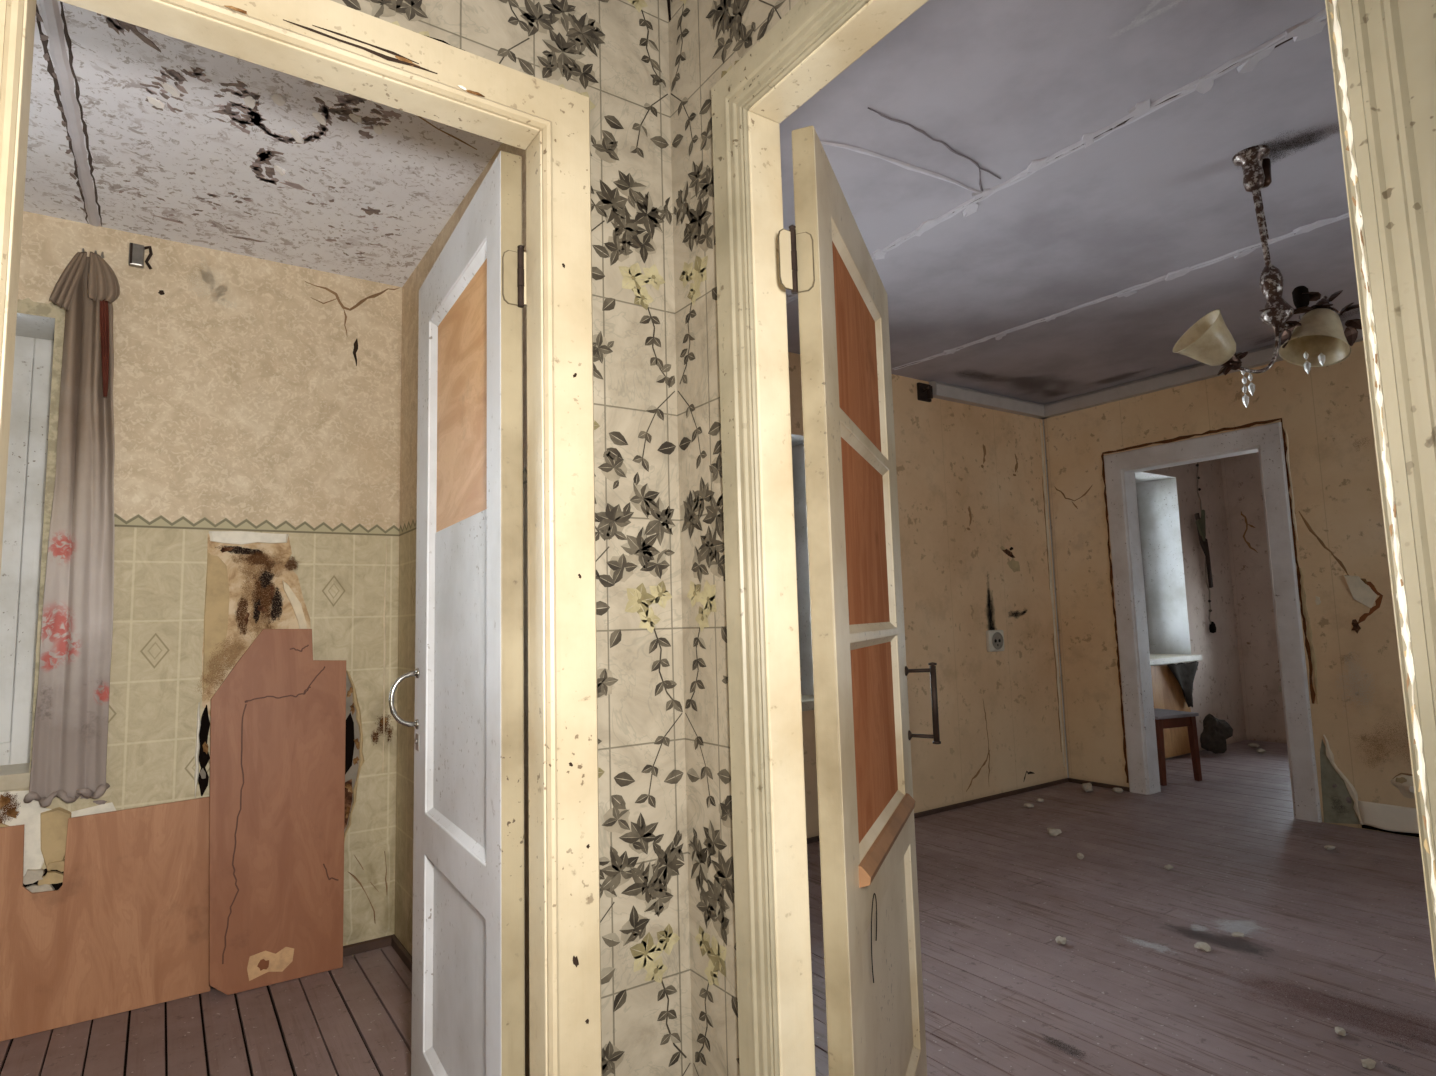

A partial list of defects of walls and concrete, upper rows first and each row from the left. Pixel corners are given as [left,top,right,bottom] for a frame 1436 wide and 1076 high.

crack [820,8,1327,260]
crack [305,281,398,366]
crack [786,294,798,304]
spalling [195,531,310,715]
crack [1024,418,1383,783]
crack [966,701,990,792]